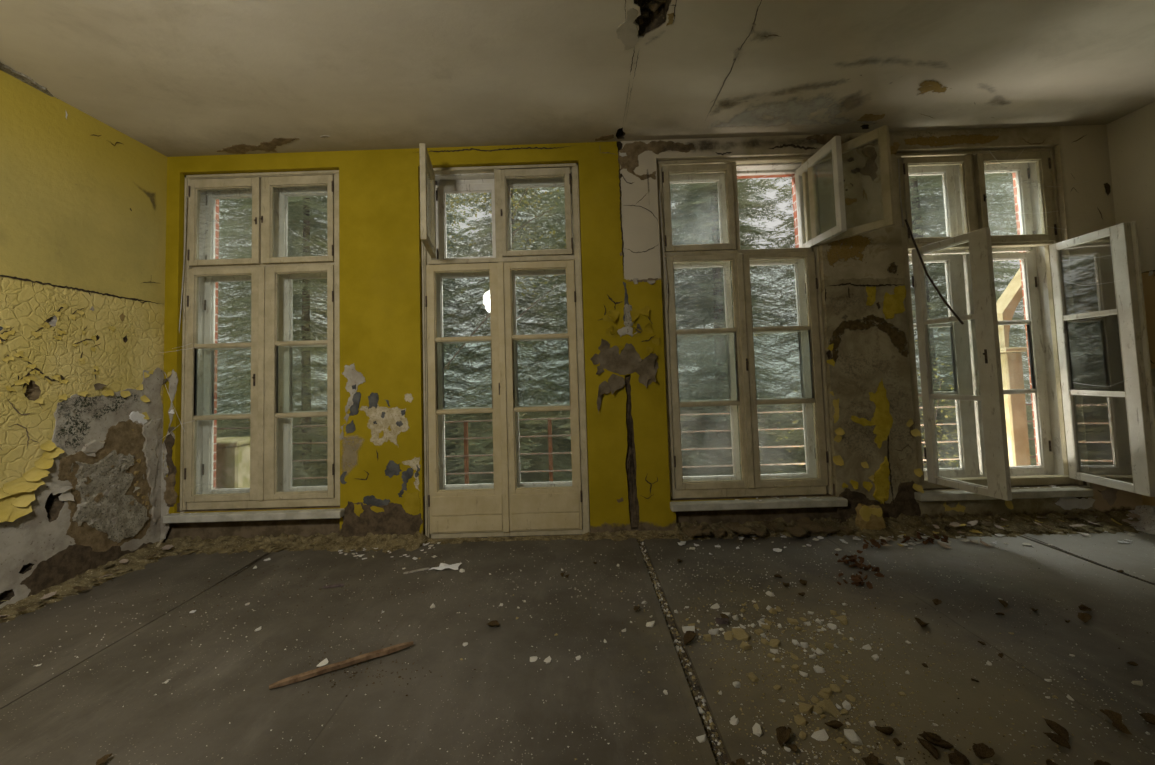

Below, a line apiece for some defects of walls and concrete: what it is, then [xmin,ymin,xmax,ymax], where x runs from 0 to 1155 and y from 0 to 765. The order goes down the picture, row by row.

peeling [616,8,639,50]
crack [705,0,778,121]
crack [768,143,820,151]
peeling [806,133,901,191]
peeling [866,285,906,319]
peeling [590,304,660,413]
crack [0,397,43,450]
peeling [339,363,423,537]
peeling [0,354,196,619]